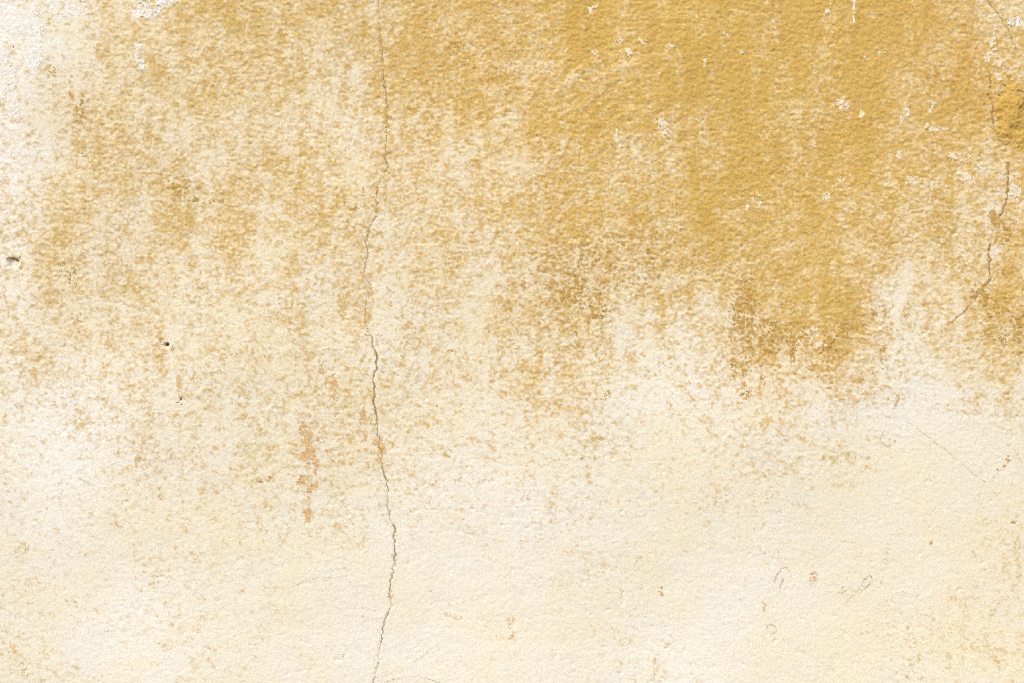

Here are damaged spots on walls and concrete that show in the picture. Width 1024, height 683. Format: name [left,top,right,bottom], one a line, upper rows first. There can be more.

crack [949,72,1018,323]
crack [362,0,440,683]
water stain [546,250,611,399]
water stain [727,270,800,403]
water stain [822,311,864,389]
water stain [980,264,1024,375]